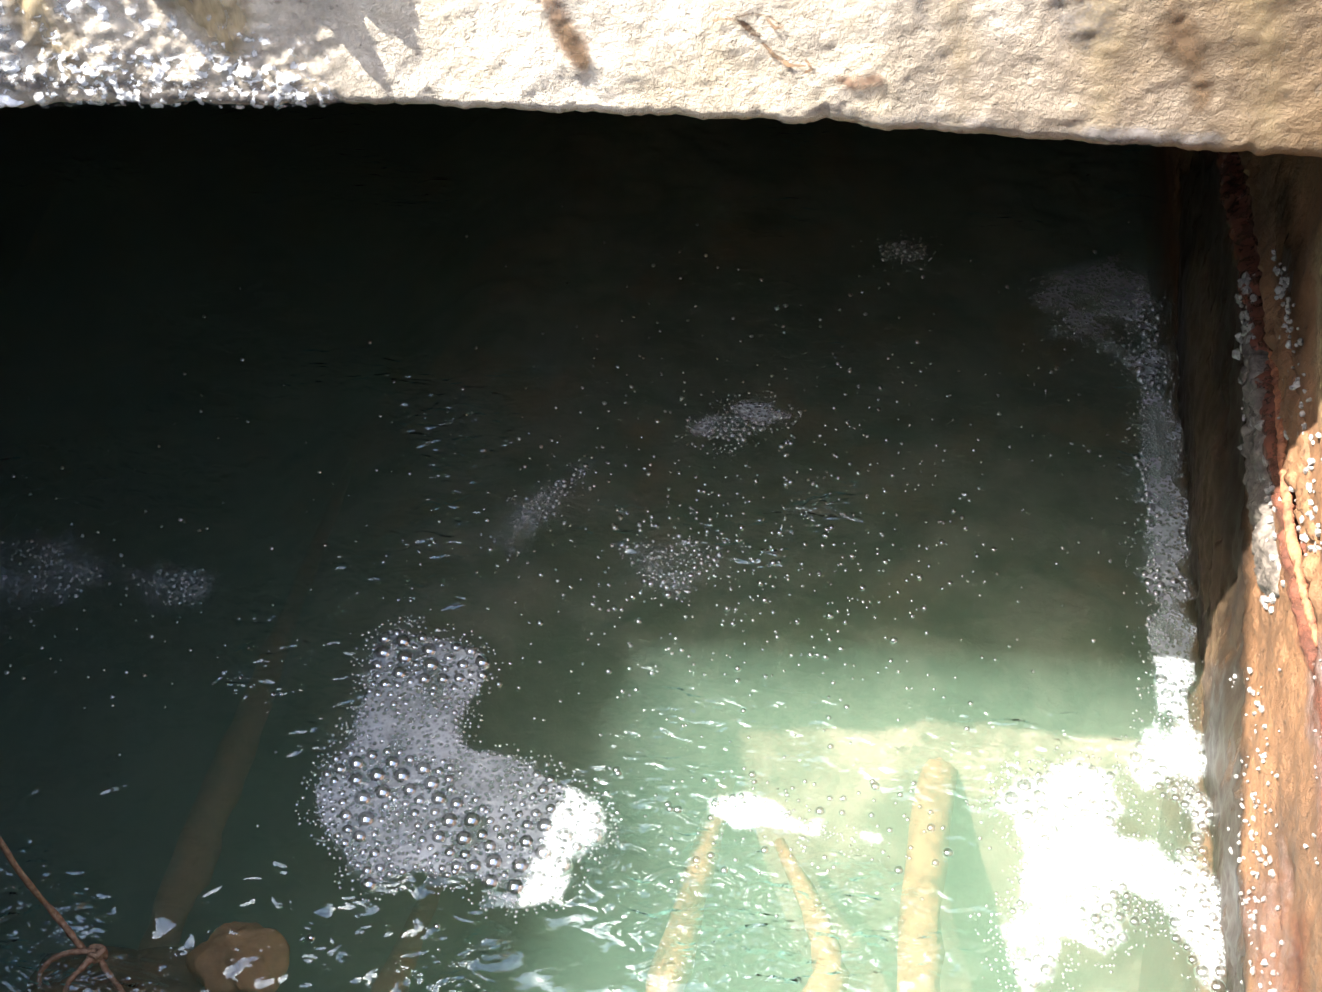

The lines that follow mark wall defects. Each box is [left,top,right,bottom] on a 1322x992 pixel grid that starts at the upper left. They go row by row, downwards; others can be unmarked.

water stain [0,0,330,108]
corrosion [542,0,588,68]
crack [713,13,813,73]
corrosion [1217,152,1322,738]